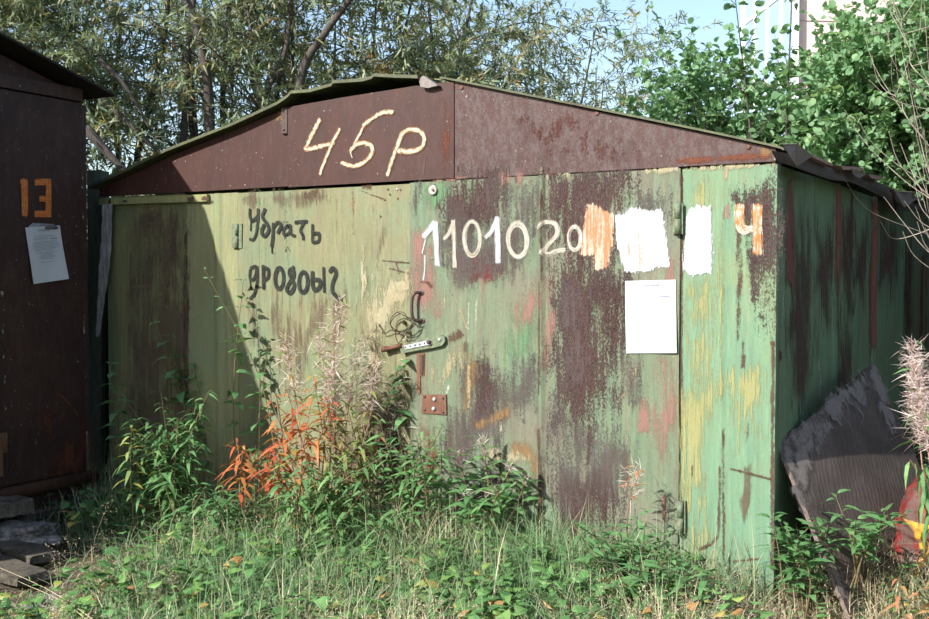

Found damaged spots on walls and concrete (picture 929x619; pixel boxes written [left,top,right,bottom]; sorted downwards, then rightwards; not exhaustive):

rust [182,231,190,392]
rust [448,330,478,413]
rust [465,247,503,292]
rust [476,407,510,430]
peeling [360,115,775,569]
rust [677,147,914,570]
peeling [782,376,867,467]
rust [536,429,545,534]